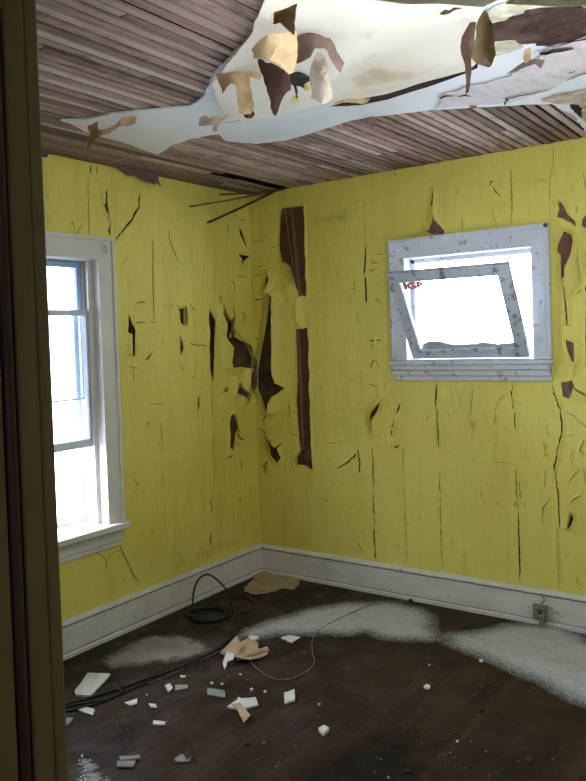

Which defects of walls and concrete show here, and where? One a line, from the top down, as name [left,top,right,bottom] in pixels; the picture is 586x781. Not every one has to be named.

flaking render [330,63,478,107]
peeling [554,190,586,412]
peeling [123,309,139,361]
peeling [173,302,190,360]
peeling [205,203,315,473]
crack [90,545,141,583]